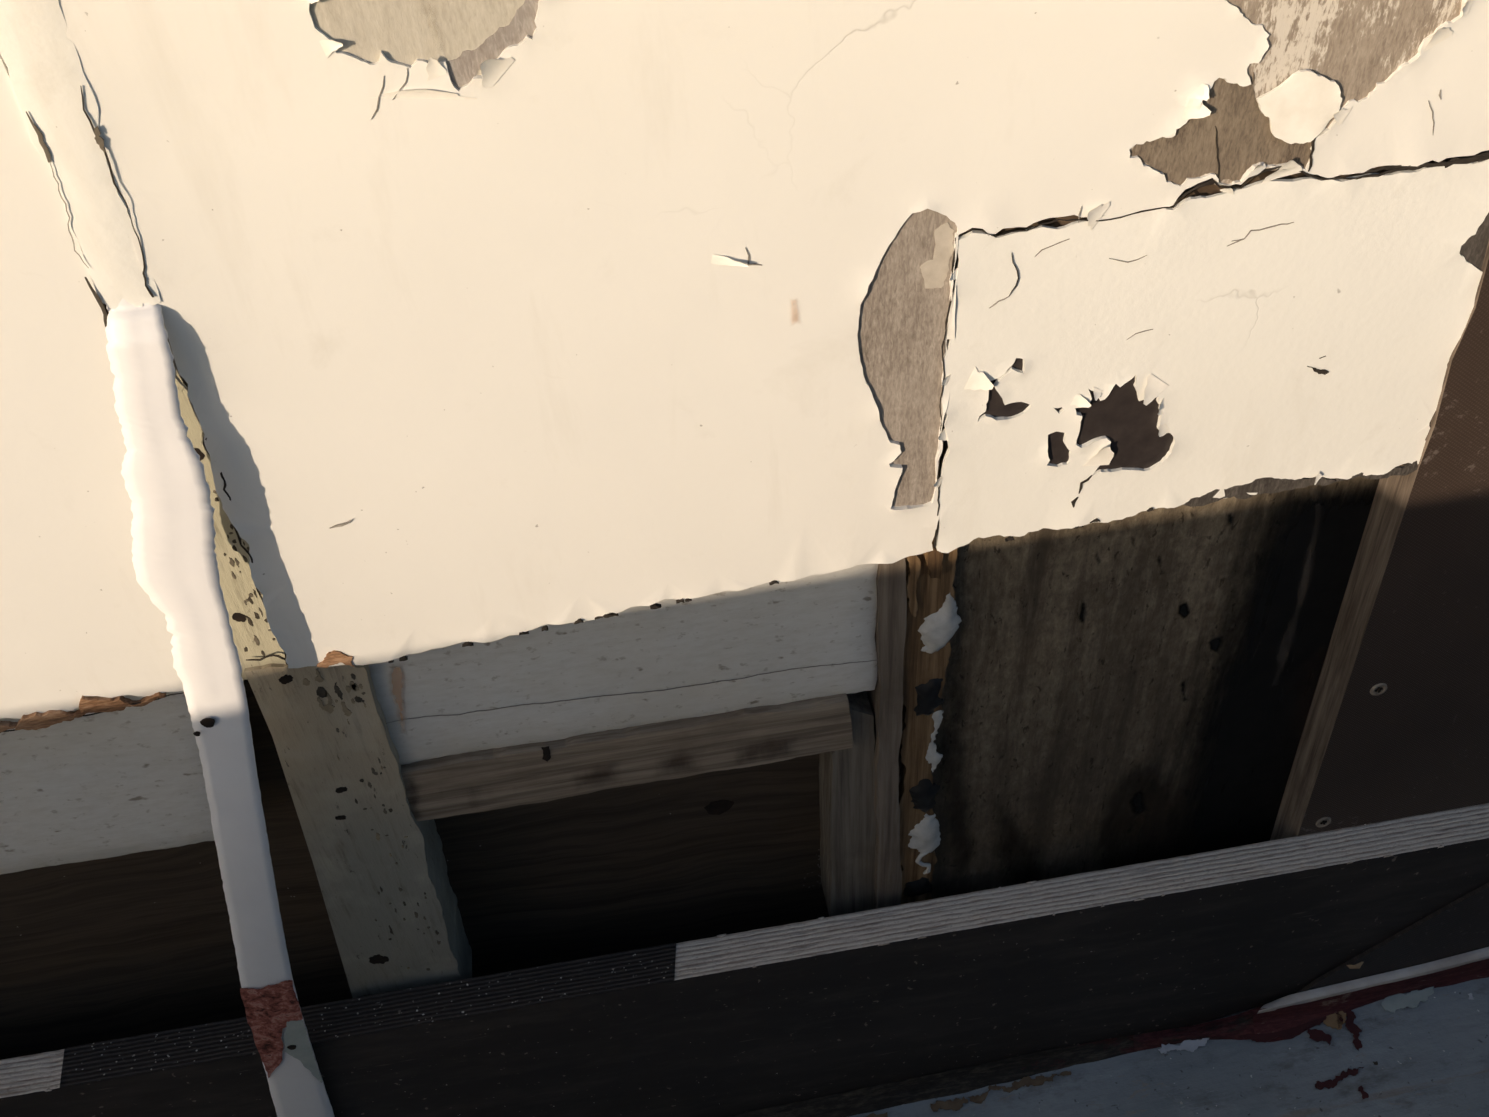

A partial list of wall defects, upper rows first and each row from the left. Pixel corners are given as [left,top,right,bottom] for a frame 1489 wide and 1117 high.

peeling [301,0,539,89]
peeling [1130,0,1474,186]
crack [26,111,107,327]
crack [80,85,263,602]
peeling [857,209,1029,506]
peeling [1048,374,1173,507]
crack [934,90,1489,547]
leakage [941,658,970,863]
leakage [1000,819,1038,885]
leakage [1101,479,1380,869]